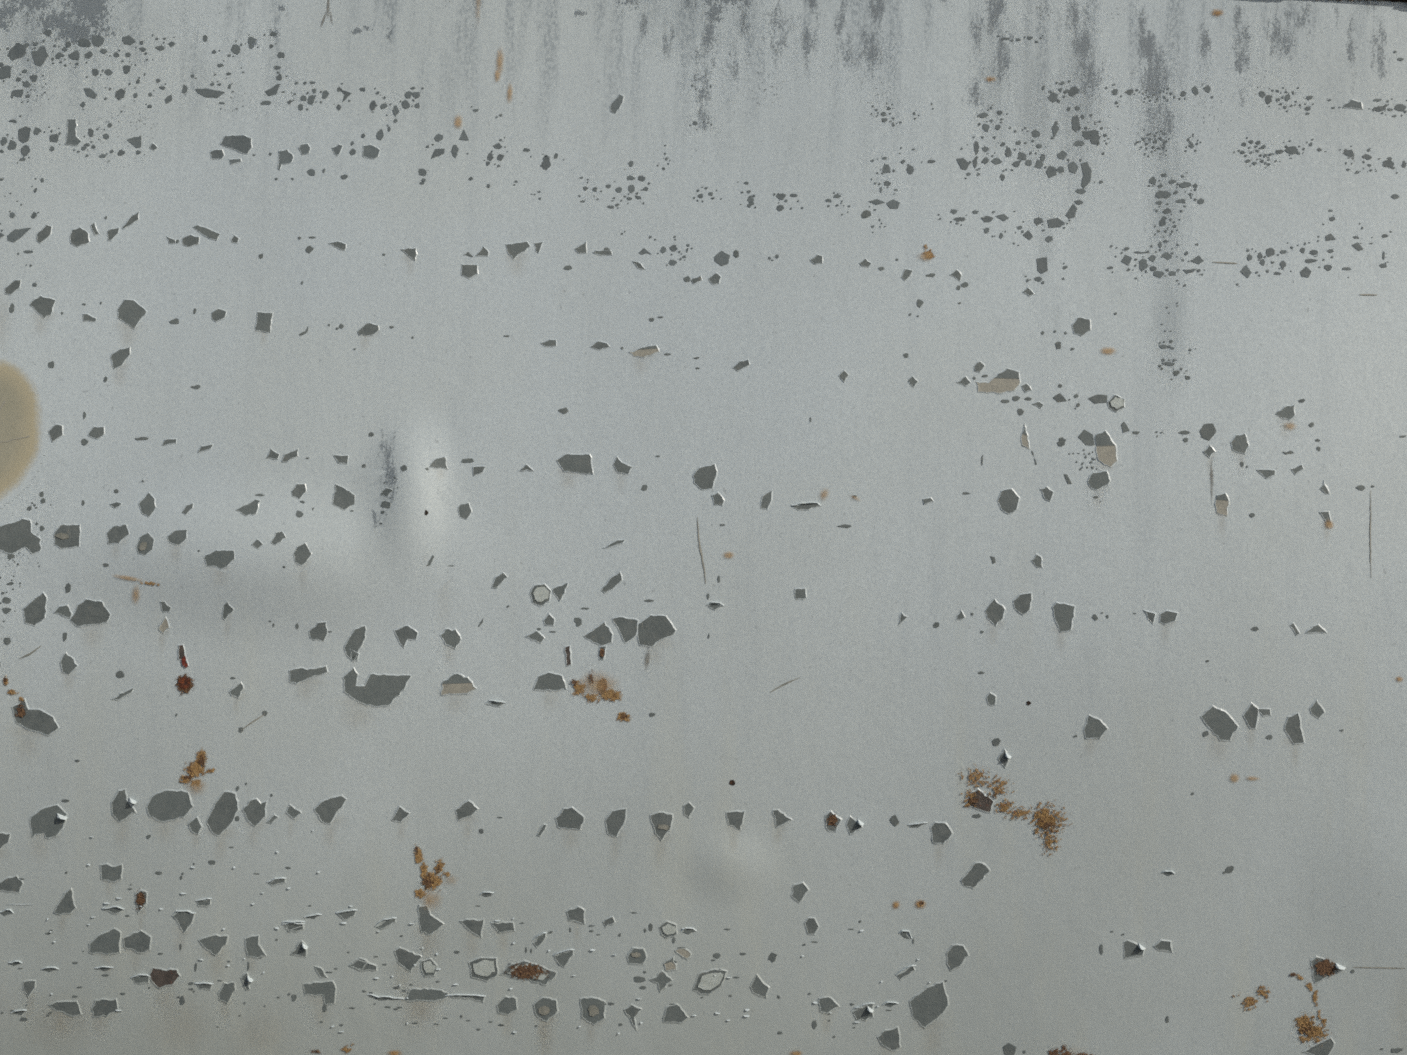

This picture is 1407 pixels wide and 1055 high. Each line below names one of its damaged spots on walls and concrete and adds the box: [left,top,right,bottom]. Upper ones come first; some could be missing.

peeling [0,30,424,165]
peeling [938,80,1109,297]
peeling [0,491,112,645]
corrosion [175,657,195,695]
peeling [288,625,412,708]
corrosion [571,671,630,722]
peeling [532,614,677,692]
corrosion [179,750,215,788]
peeling [110,788,348,848]
corrosion [958,763,1071,858]
corrosion [413,846,450,902]
corrosion [1290,973,1332,1047]